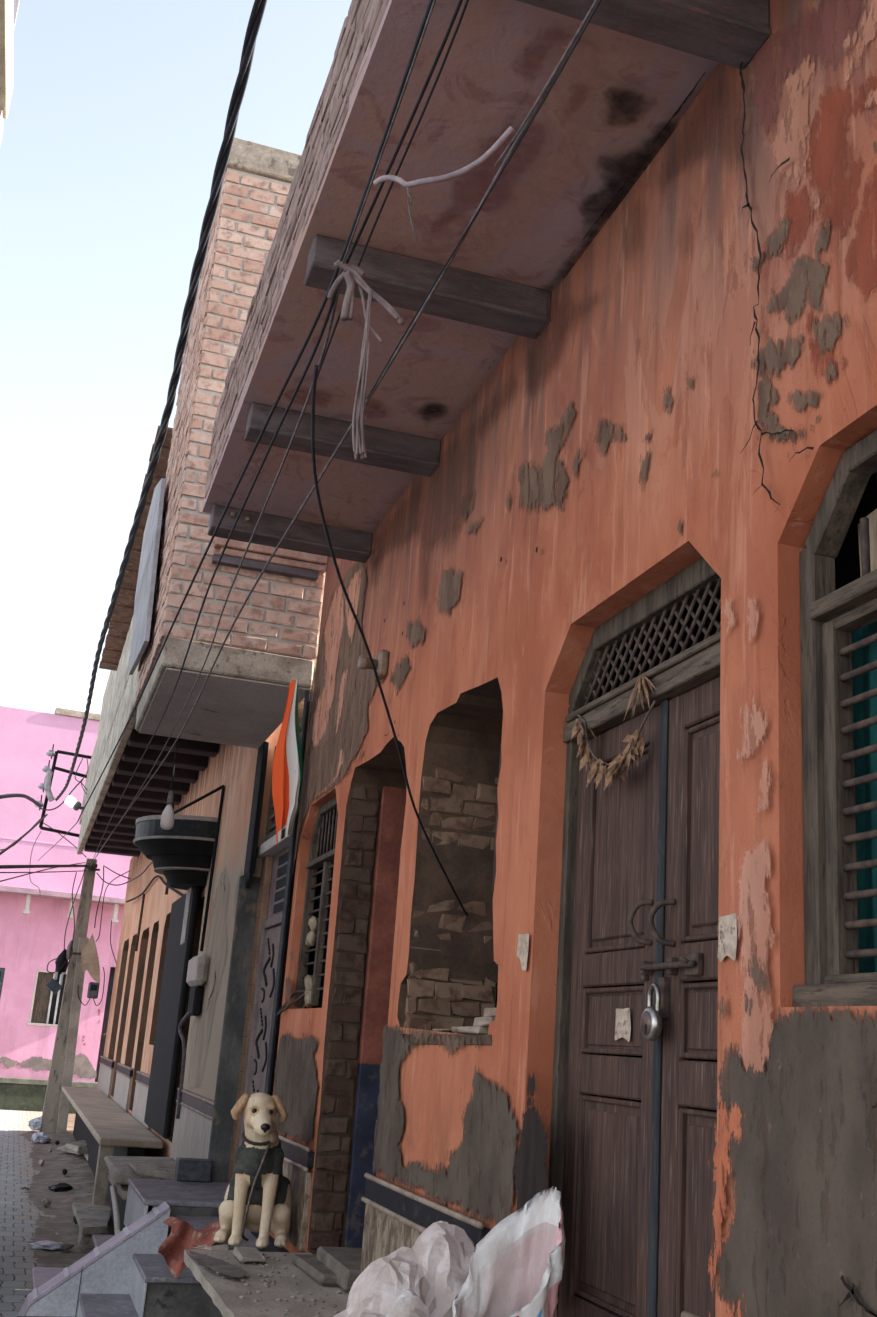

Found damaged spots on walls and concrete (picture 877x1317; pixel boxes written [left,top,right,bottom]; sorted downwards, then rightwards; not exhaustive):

crack [667,72,705,124]
peeling [750,0,877,449]
crack [739,63,814,512]
flaking render [506,401,625,517]
flaking render [638,430,654,486]
peeling [721,597,759,643]
flaking render [292,562,428,874]
peeling [737,697,773,813]
flaking render [0,1056,52,1072]
flaking render [73,1035,97,1079]
flaking render [371,1022,520,1227]
flaking render [713,840,877,1317]